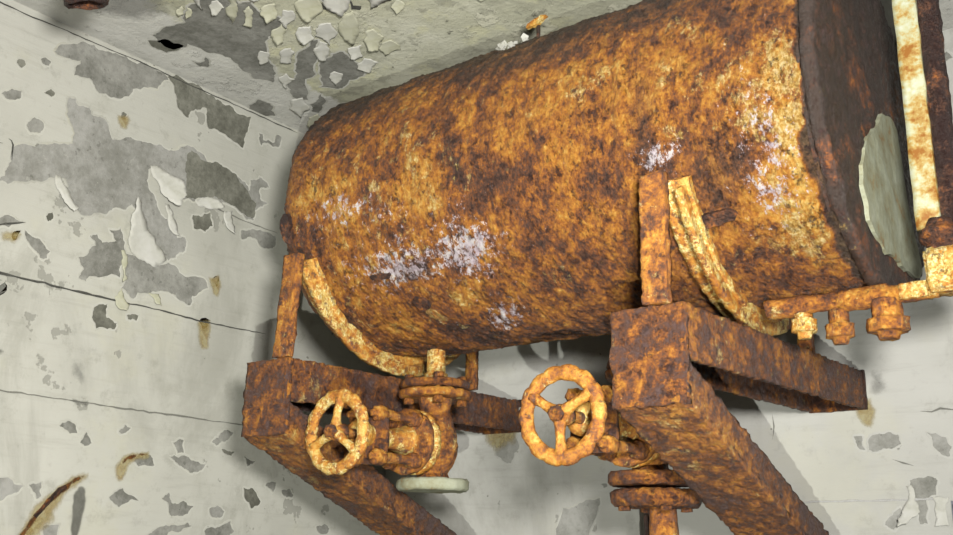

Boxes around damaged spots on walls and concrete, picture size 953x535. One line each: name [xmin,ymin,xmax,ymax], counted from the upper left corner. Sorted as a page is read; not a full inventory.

peeling [147,0,406,128]
peeling [0,39,283,331]
corrosion [199,323,209,348]
corrosion [117,453,148,479]
spalling [0,475,85,535]
peeling [108,486,140,509]
peeling [146,491,235,535]
peeling [242,480,294,511]